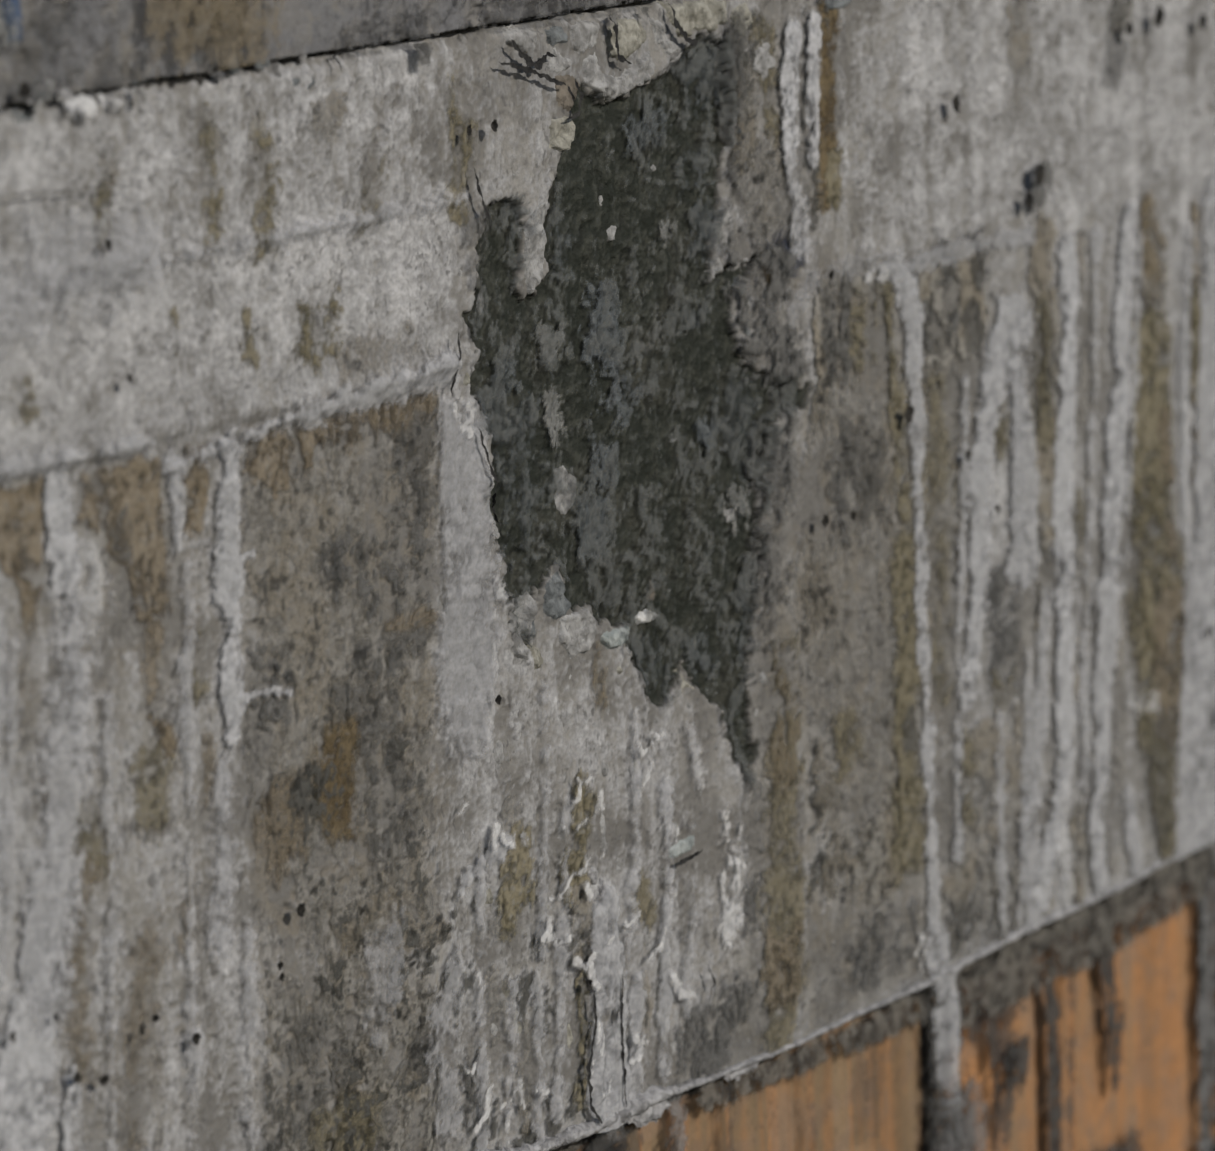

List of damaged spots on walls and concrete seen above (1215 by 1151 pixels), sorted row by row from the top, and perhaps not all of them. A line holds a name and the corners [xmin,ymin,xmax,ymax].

damp [1004,0,1036,117]
spalling [458,0,818,786]
damp [209,172,1215,1151]
damp [0,444,231,1151]
flaking render [492,822,514,850]
flaking render [528,760,641,991]
flaking render [475,1063,550,1144]
flaking render [567,1016,605,1074]
crack [586,974,627,1124]
flaking render [625,1023,678,1064]
flaking render [643,927,667,960]
flaking render [671,972,696,1000]